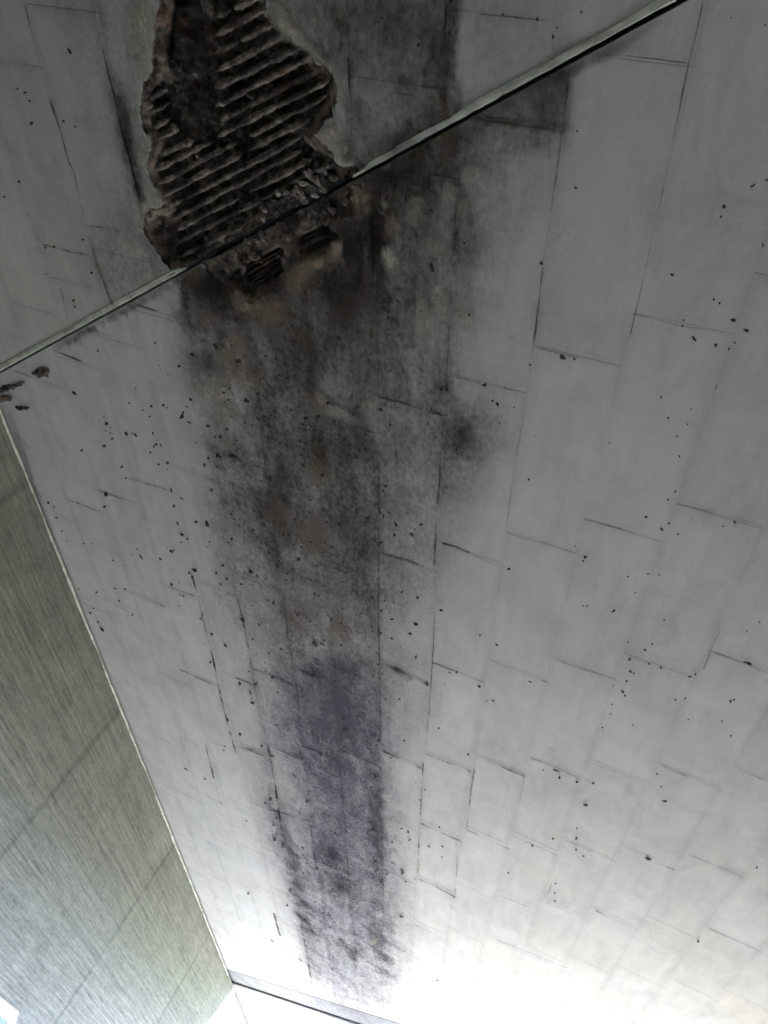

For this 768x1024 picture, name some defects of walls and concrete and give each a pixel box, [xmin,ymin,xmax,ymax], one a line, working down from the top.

water stain [110,82,160,214]
spalling [141,0,364,302]
water stain [159,0,582,1008]